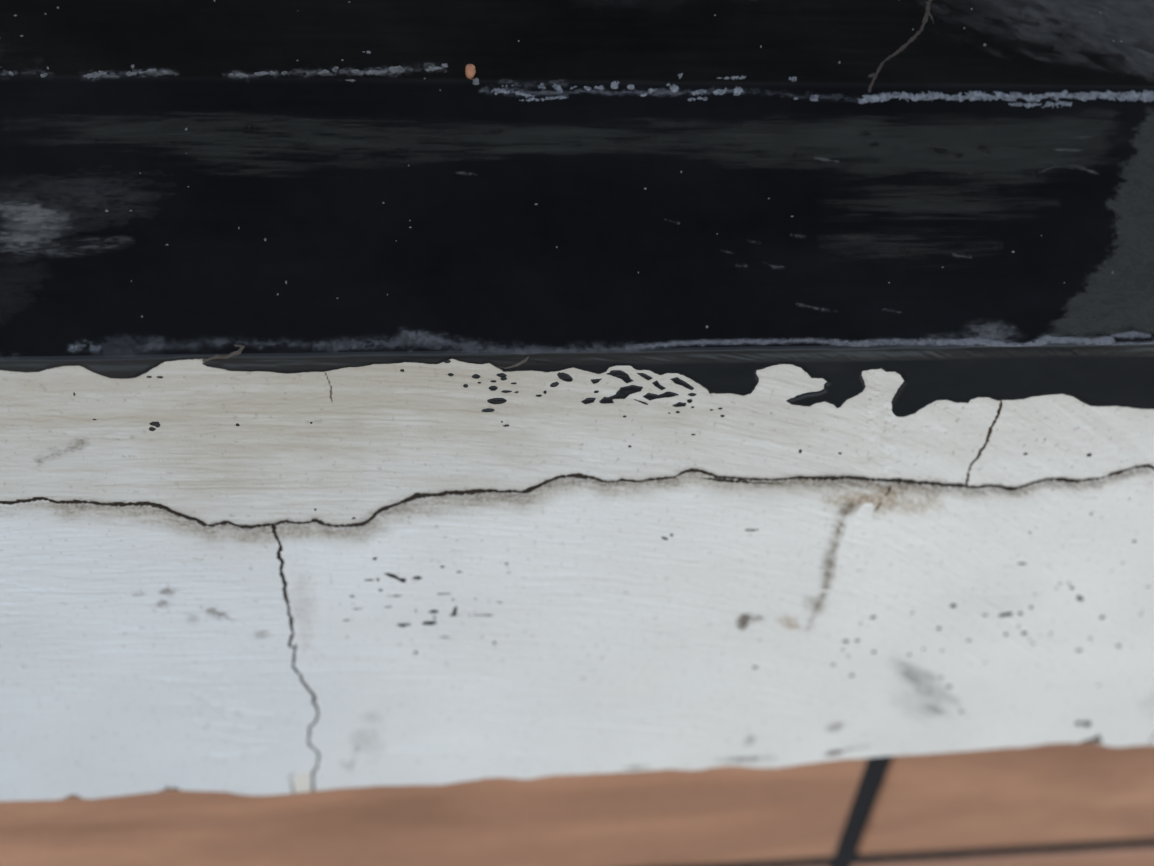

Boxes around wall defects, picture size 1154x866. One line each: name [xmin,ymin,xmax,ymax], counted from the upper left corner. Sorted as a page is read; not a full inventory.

crack [868,0,934,92]
peeling [0,341,1154,417]
crack [0,400,1154,793]
leakage [816,505,853,608]
leakage [982,594,1037,645]